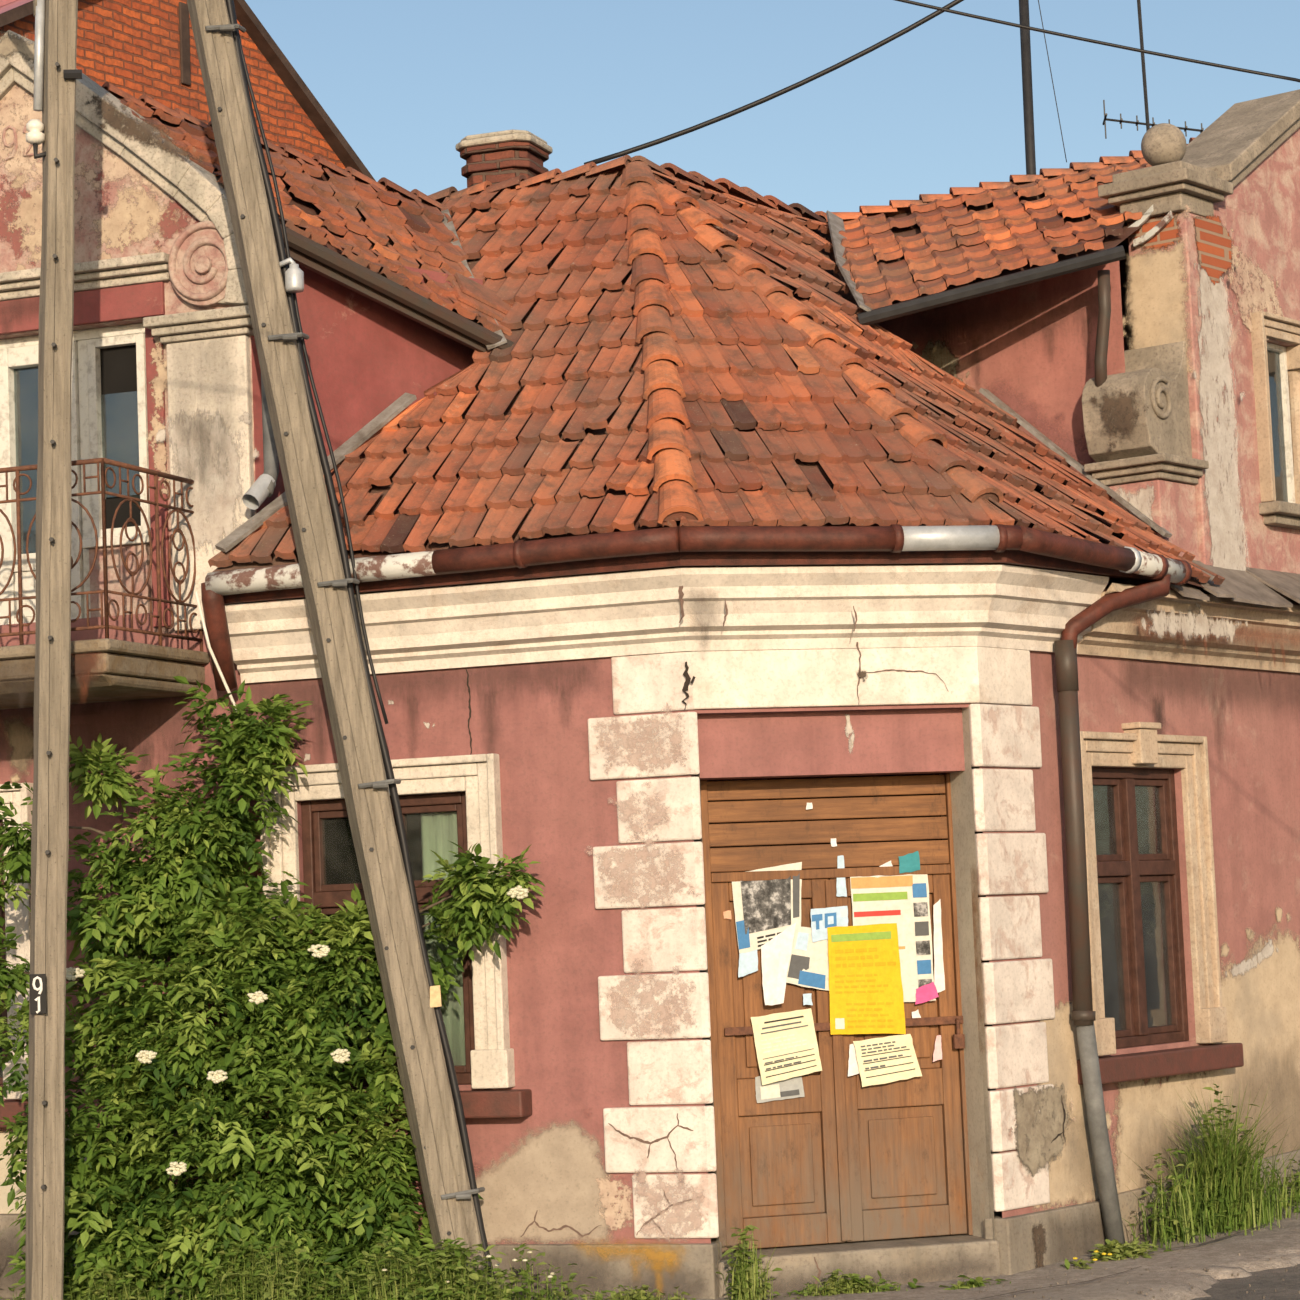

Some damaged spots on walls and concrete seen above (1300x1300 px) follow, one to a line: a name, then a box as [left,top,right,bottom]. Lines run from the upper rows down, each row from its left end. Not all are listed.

peeling [0,83,43,271]
peeling [74,95,203,260]
peeling [1122,205,1284,571]
crack [681,662,696,710]
crack [853,606,948,705]
peeling [1142,592,1248,641]
flaking render [1106,908,1300,1193]
flaking render [0,1130,27,1214]
crack [521,1210,601,1237]
flaking render [474,1121,704,1244]
crack [608,1113,693,1235]
flaking render [1009,1002,1100,1269]